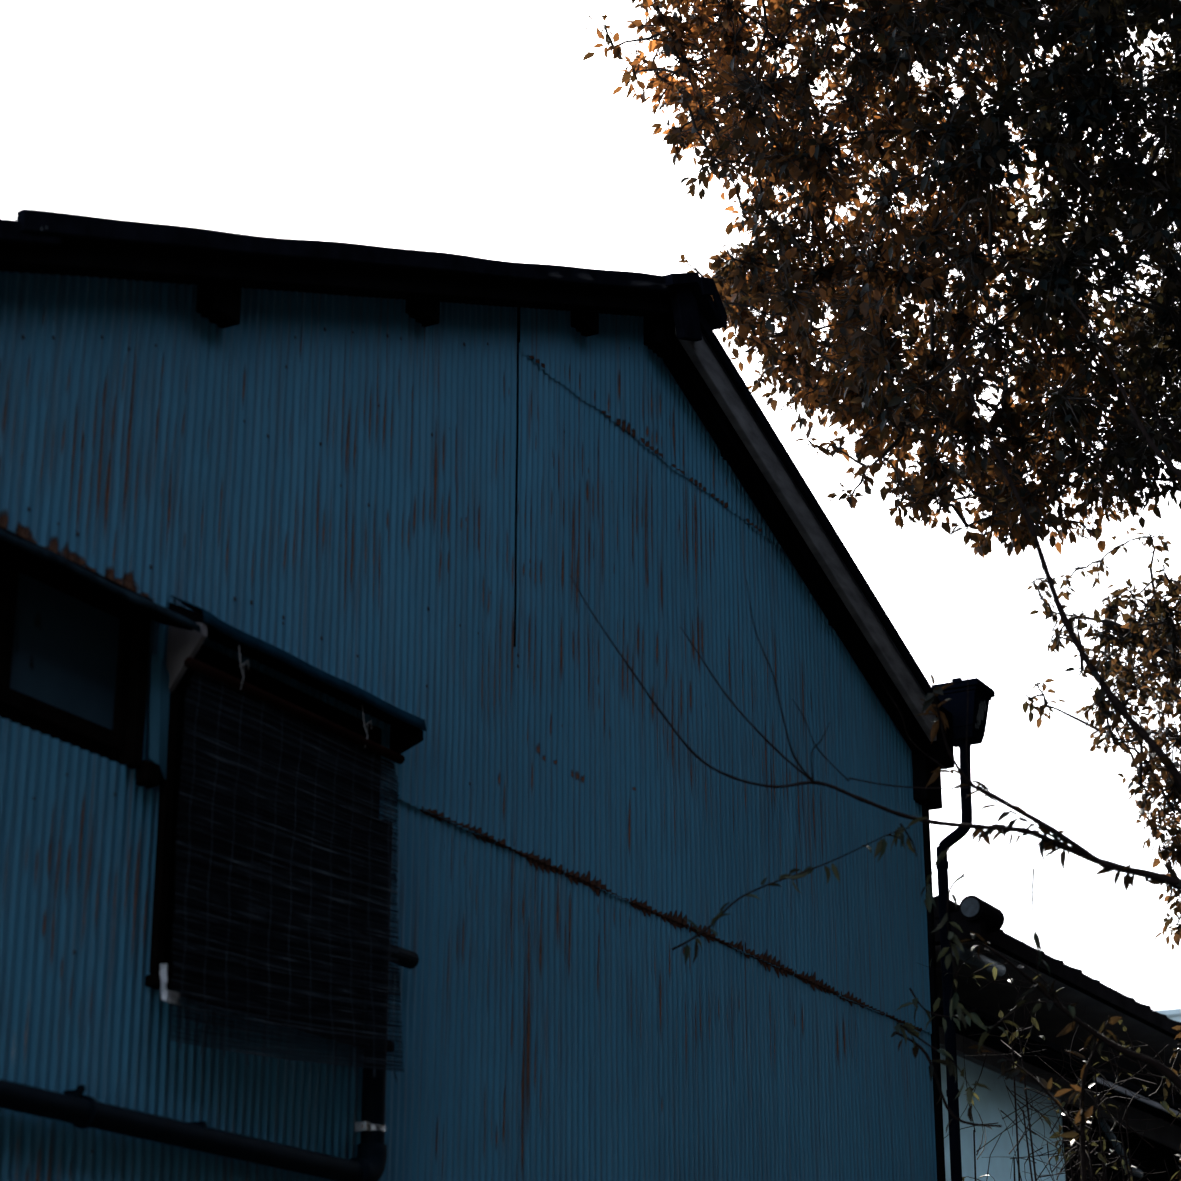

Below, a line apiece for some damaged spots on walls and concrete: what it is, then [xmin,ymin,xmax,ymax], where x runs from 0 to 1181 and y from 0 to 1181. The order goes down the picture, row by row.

rust [0,350,185,601]
rust [323,356,413,473]
rust [277,428,486,609]
rust [506,438,615,736]
rust [594,371,728,608]
rust [617,614,733,846]
rust [25,793,150,1031]
rust [419,807,922,1181]